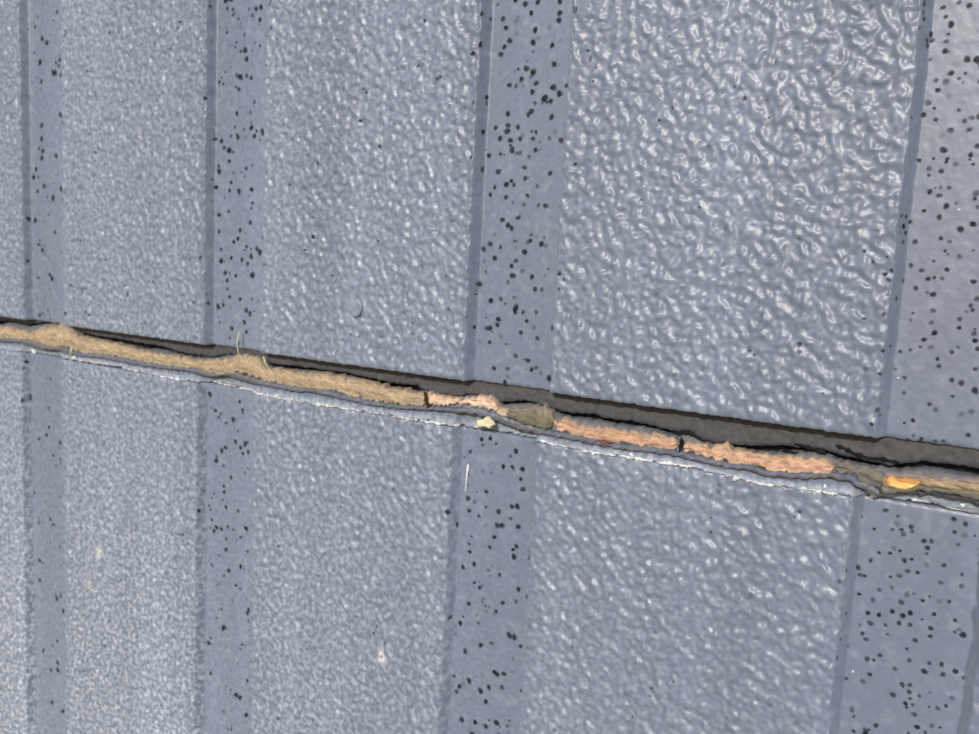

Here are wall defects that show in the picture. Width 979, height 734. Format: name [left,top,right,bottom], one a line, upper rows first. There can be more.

crack [0,319,53,327]
crack [79,331,226,358]
crack [274,364,430,408]
crack [505,400,706,453]
crack [734,443,979,474]